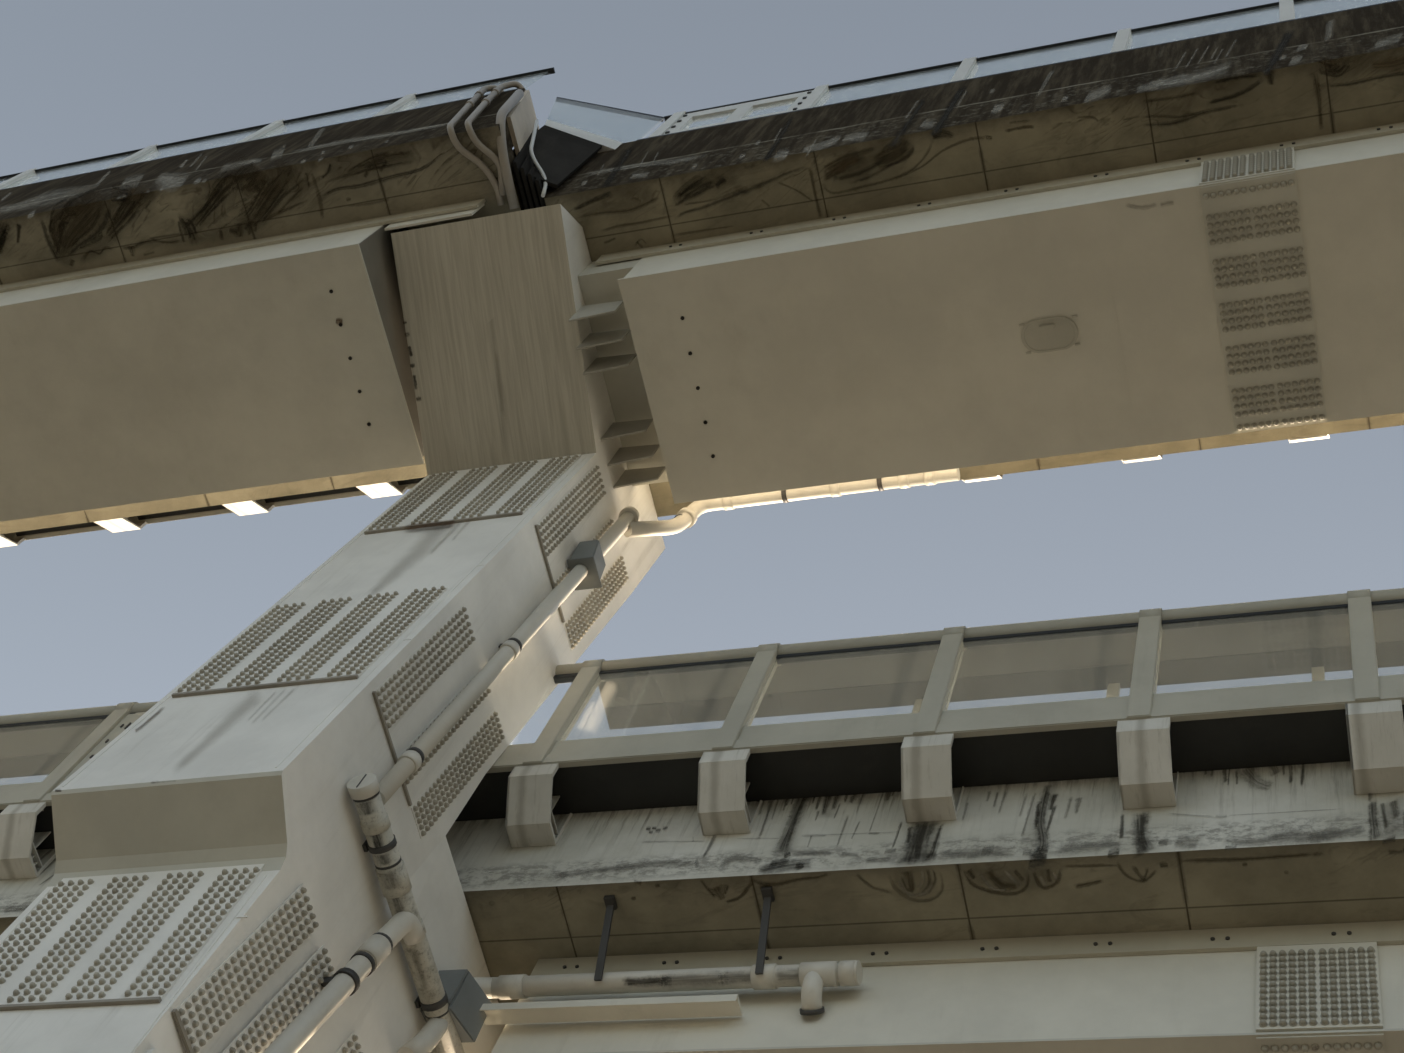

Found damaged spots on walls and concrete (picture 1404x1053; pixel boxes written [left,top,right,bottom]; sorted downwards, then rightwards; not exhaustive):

leakage [760,794,875,858]
leakage [868,823,1060,895]
leakage [1029,787,1057,853]
leakage [1064,813,1351,882]
leakage [1369,793,1404,844]